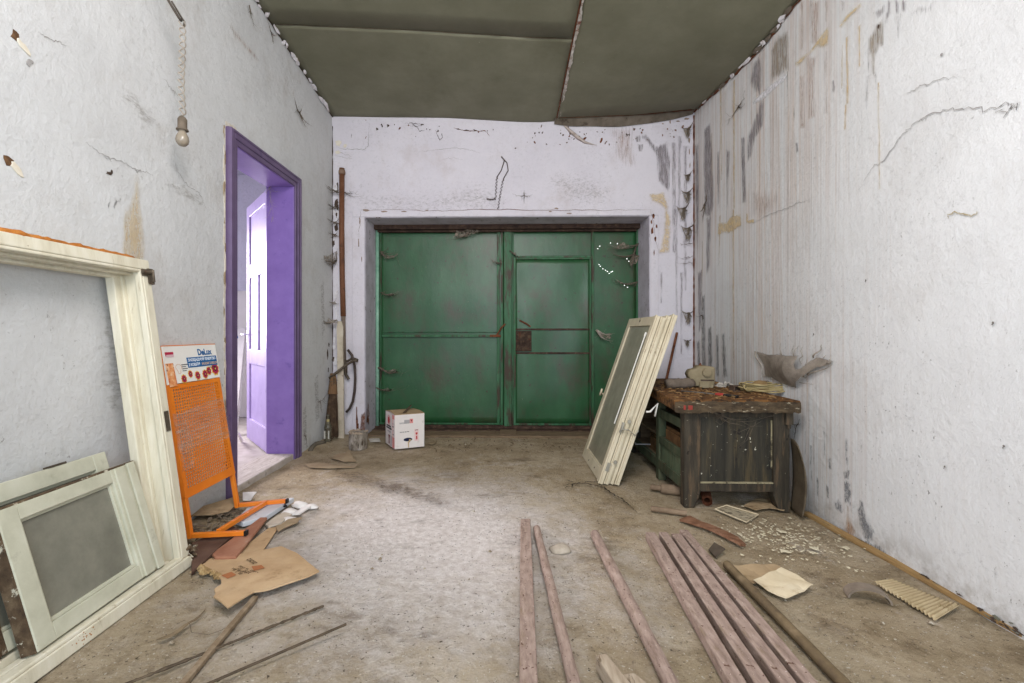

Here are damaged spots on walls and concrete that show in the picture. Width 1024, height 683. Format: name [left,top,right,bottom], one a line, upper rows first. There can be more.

flaking render [255,0,329,112]
crack [693,0,801,367]
crack [859,102,1018,189]
crack [565,480,636,511]